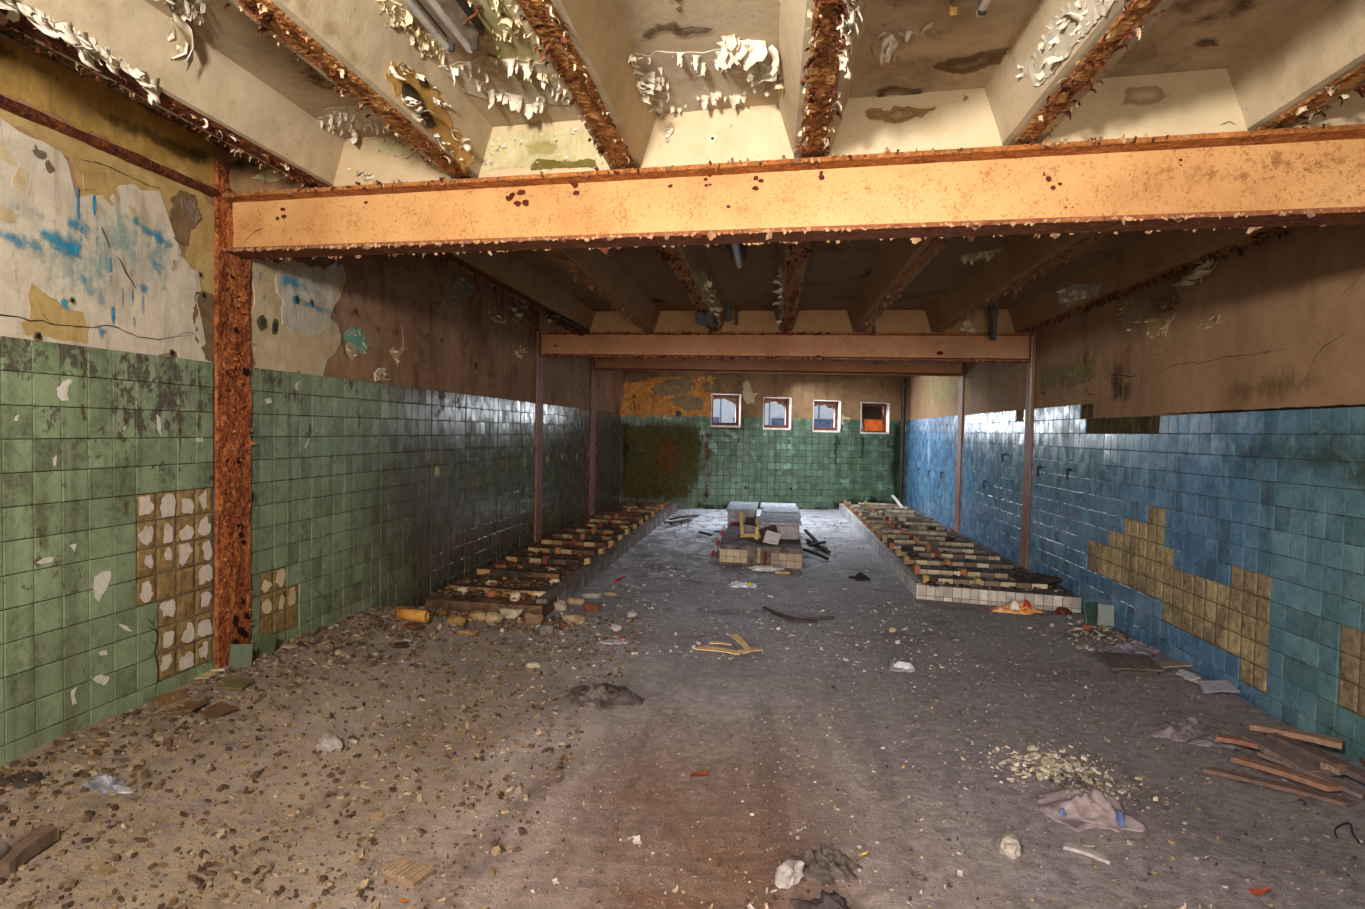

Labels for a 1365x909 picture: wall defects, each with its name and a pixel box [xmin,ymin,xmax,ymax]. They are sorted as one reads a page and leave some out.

peeling [0,0,161,105]
corrosion [0,9,407,198]
corrosion [224,0,503,186]
peeling [377,0,601,195]
corrosion [507,0,677,177]
peeling [627,34,785,143]
corrosion [782,0,962,164]
corrosion [1015,0,1166,148]
corrosion [1249,76,1365,138]
peeling [0,118,215,365]
peeling [250,257,370,390]
peeling [136,488,215,681]